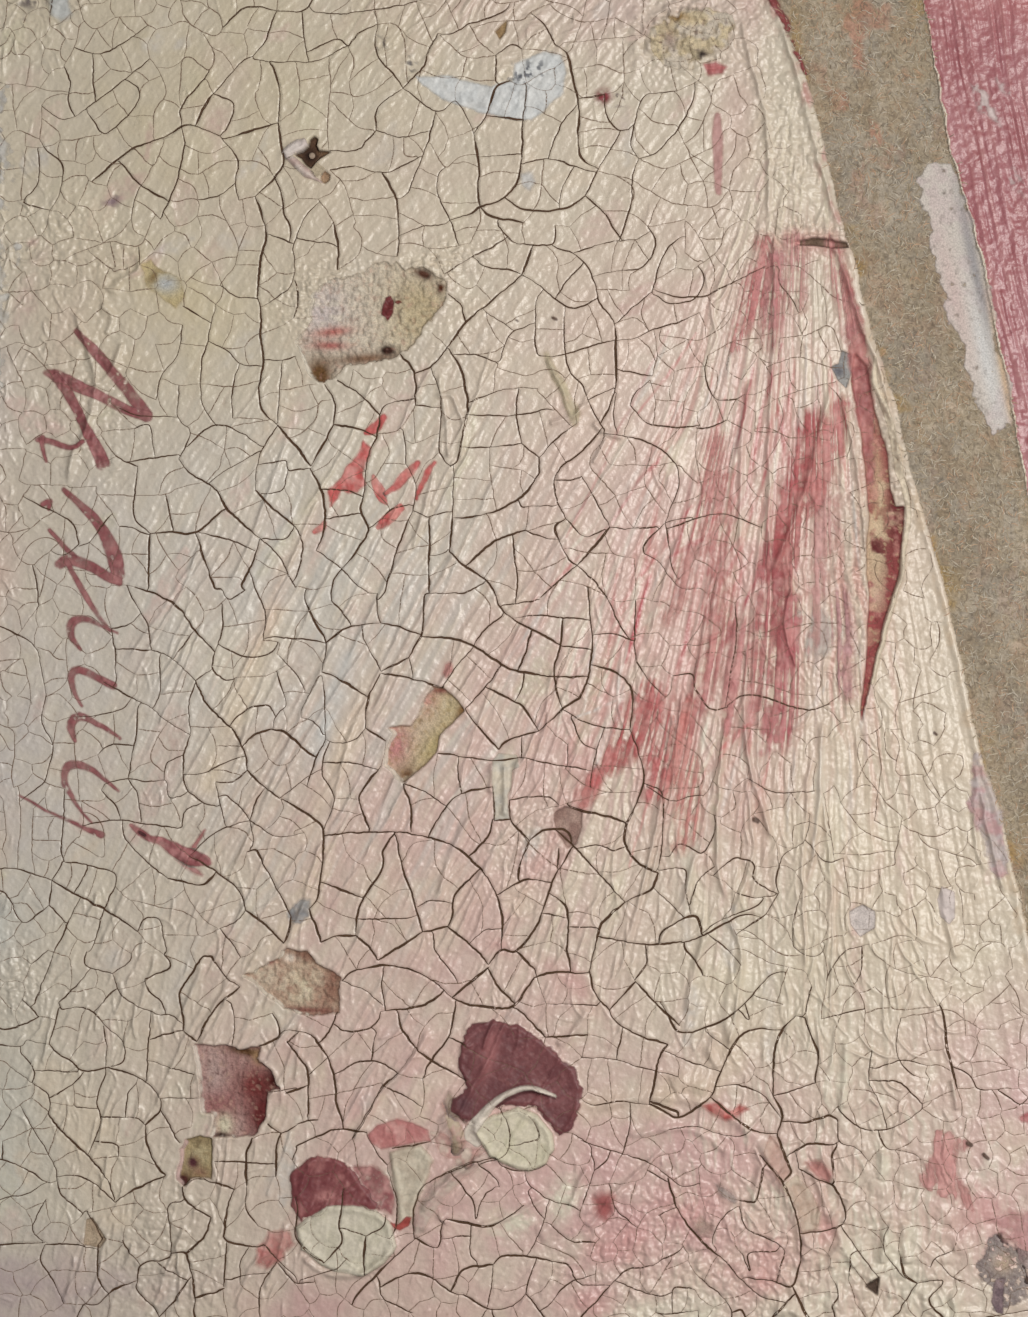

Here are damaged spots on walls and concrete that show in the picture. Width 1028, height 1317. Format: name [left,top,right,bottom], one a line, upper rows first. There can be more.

crack [42,26,166,152]
crack [21,140,64,210]
peeling [295,262,446,383]
crack [78,0,878,1317]
peeling [384,687,464,782]
crack [0,497,346,1317]
peeling [242,948,341,1016]
peeling [177,1044,280,1184]
crack [838,968,1028,1156]
crack [883,1229,965,1317]